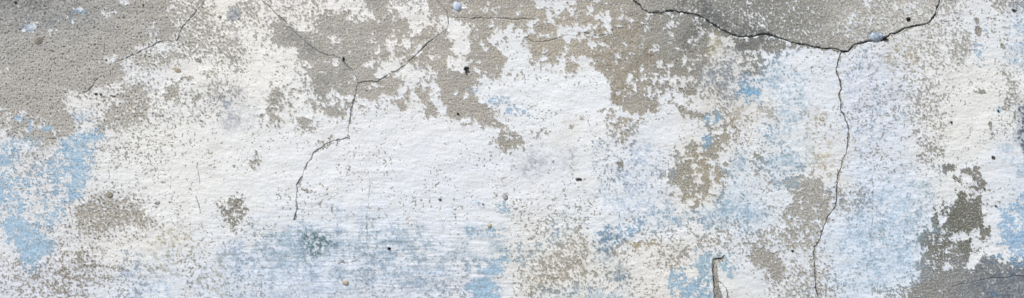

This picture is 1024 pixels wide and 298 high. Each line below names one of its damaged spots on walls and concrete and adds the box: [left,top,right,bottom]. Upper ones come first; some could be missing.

peeling [20,177,169,298]
crack [118,3,204,62]
crack [263,0,616,220]
peeling [0,0,982,214]
peeling [515,149,879,298]
crack [633,0,940,298]
peeling [871,163,1024,298]